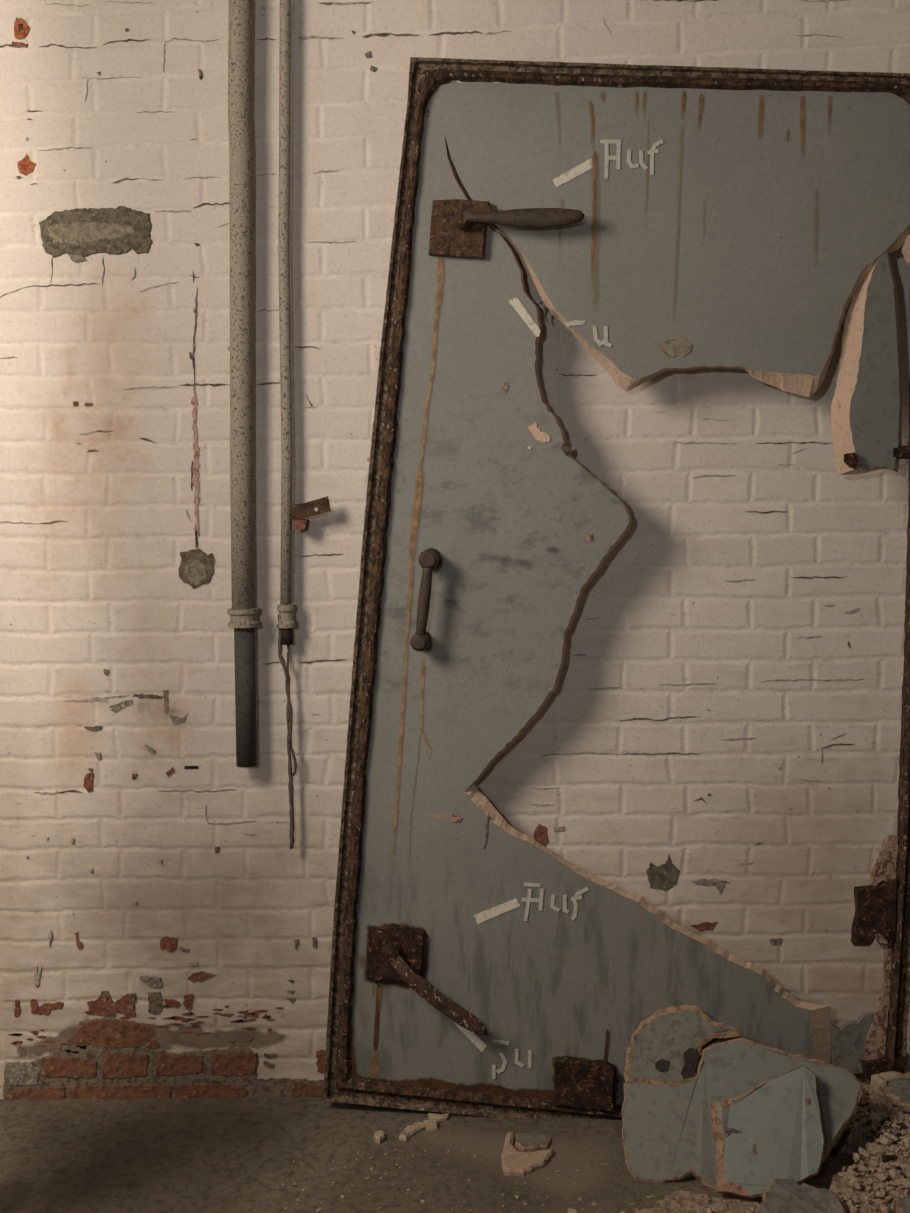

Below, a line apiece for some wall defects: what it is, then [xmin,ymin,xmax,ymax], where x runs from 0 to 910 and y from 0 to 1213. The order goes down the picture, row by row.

corrosion [787,96,805,151]
peeling [39,206,153,263]
peeling [528,423,571,456]
corrosion [843,452,860,469]
corrosion [394,259,444,851]
spalling [534,824,564,846]
spalling [646,855,725,893]
spalling [691,922,717,931]
peeling [3,936,326,1100]
corrosion [350,924,589,1100]
corrosion [604,1030,622,1108]